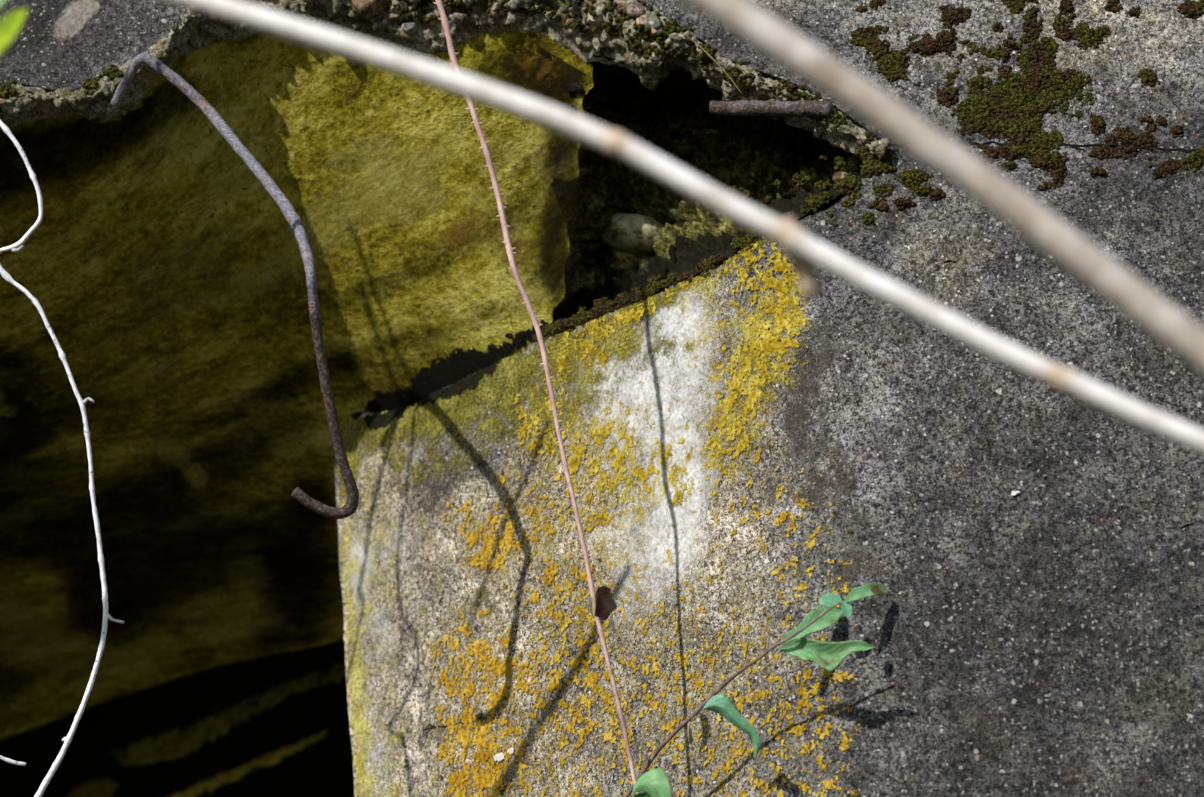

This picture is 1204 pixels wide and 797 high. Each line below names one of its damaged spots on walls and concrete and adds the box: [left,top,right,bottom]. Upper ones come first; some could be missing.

leakage [0,83,191,203]
spalling [241,0,889,223]
spalling [540,141,763,336]
leakage [0,350,369,647]